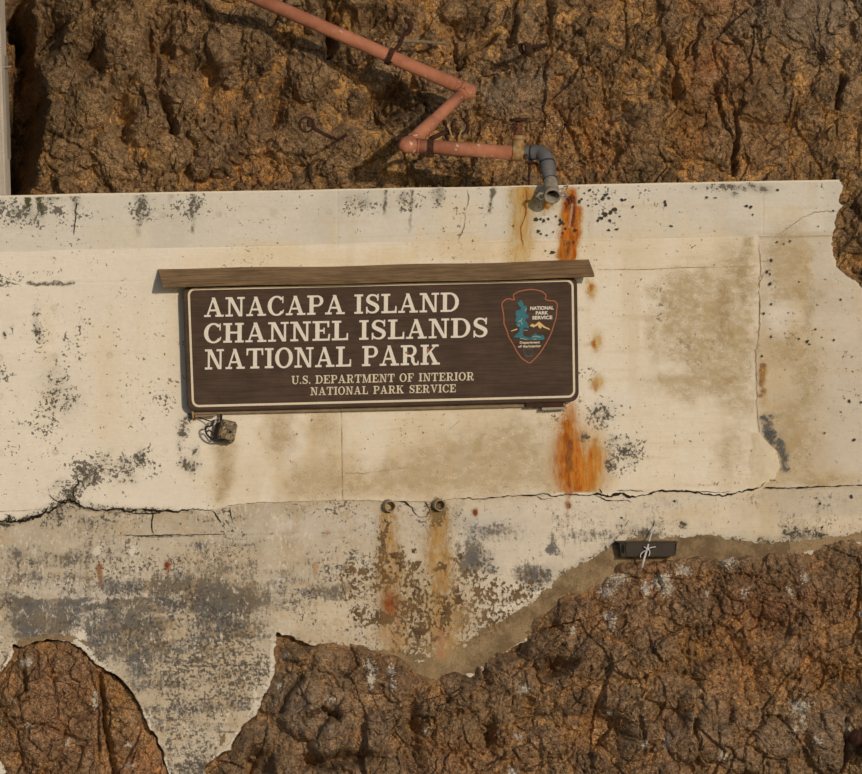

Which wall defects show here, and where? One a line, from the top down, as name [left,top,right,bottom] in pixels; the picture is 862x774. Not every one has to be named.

rust [514,186,550,262]
rust [558,188,582,260]
rust [553,407,604,508]
crack [0,478,862,536]
rust [377,505,413,651]
rust [423,501,464,660]
peeling [337,512,862,680]
peeling [0,634,115,674]
spalling [245,642,276,720]
spalling [202,731,238,765]